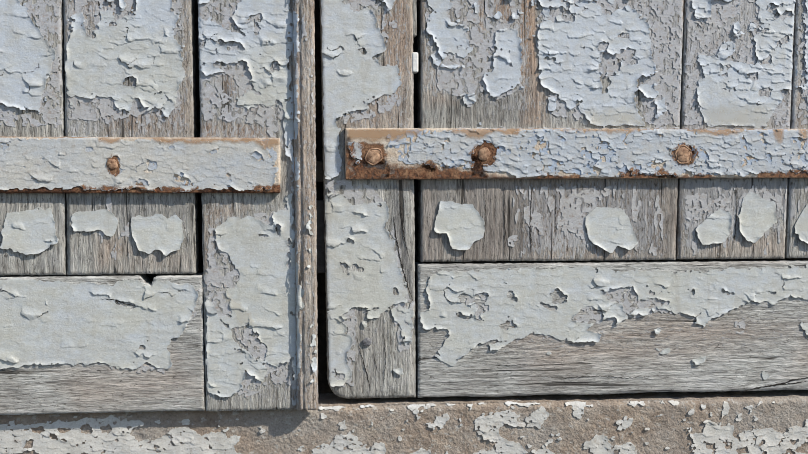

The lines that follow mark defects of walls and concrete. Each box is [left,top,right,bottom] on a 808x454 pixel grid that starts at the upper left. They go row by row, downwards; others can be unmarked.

corrosion [108,155,120,176]
corrosion [76,184,198,192]
peeling [0,0,317,406]
corrosion [155,138,278,147]
corrosion [346,129,519,179]
peeling [310,0,808,387]
corrosion [621,142,712,178]
corrosion [757,169,808,178]
peeling [0,415,241,454]
peeling [467,401,562,454]
peeling [583,416,637,454]
peeling [683,401,808,454]